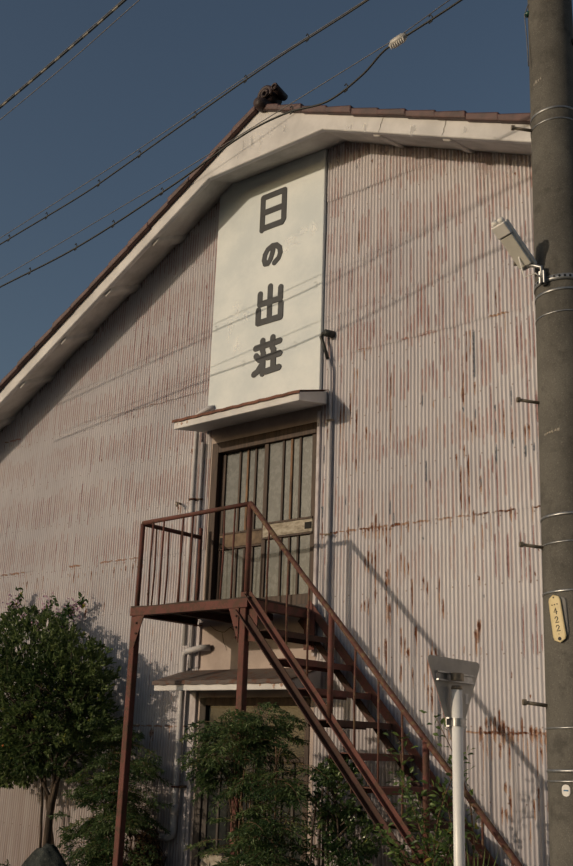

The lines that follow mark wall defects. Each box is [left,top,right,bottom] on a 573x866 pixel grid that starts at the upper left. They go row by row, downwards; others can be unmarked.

rust [320,368,515,683]
rust [424,642,444,715]
rust [466,710,547,776]
rust [501,783,512,824]